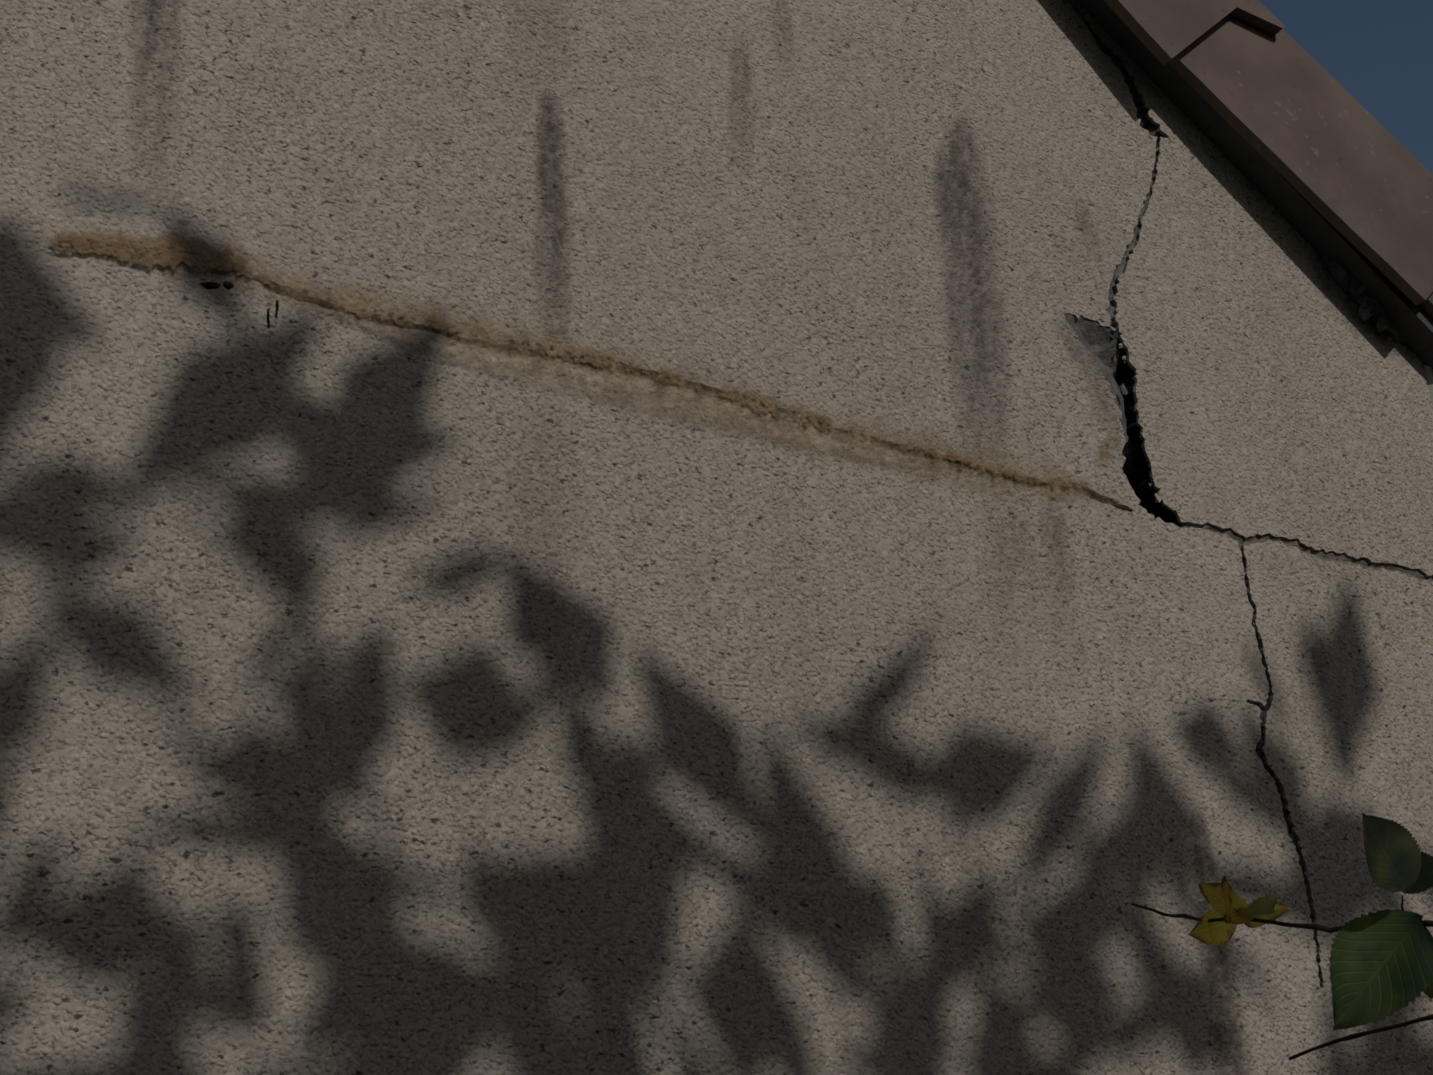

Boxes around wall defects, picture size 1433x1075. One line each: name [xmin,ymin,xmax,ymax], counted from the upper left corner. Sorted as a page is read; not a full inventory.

crack [46,8,1162,511]
crack [1181,522,1433,981]